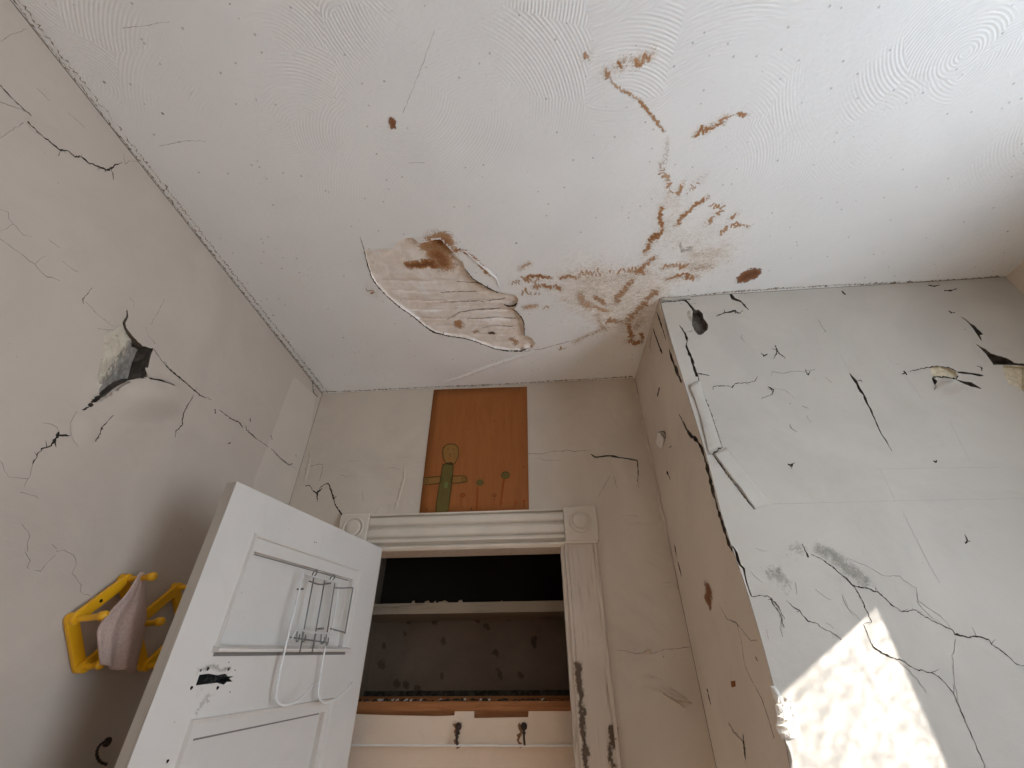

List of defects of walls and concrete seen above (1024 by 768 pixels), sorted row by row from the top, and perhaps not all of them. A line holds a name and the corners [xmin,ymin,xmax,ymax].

crack [0,0,633,397]
spalling [73,311,211,424]
spalling [360,237,588,352]
spalling [685,300,708,335]
corrosion [736,268,761,283]
peeling [901,345,1024,396]
crack [1,406,114,498]
crack [175,397,342,515]
peeling [688,380,771,510]
crack [661,275,1024,768]
corrosion [704,583,712,610]